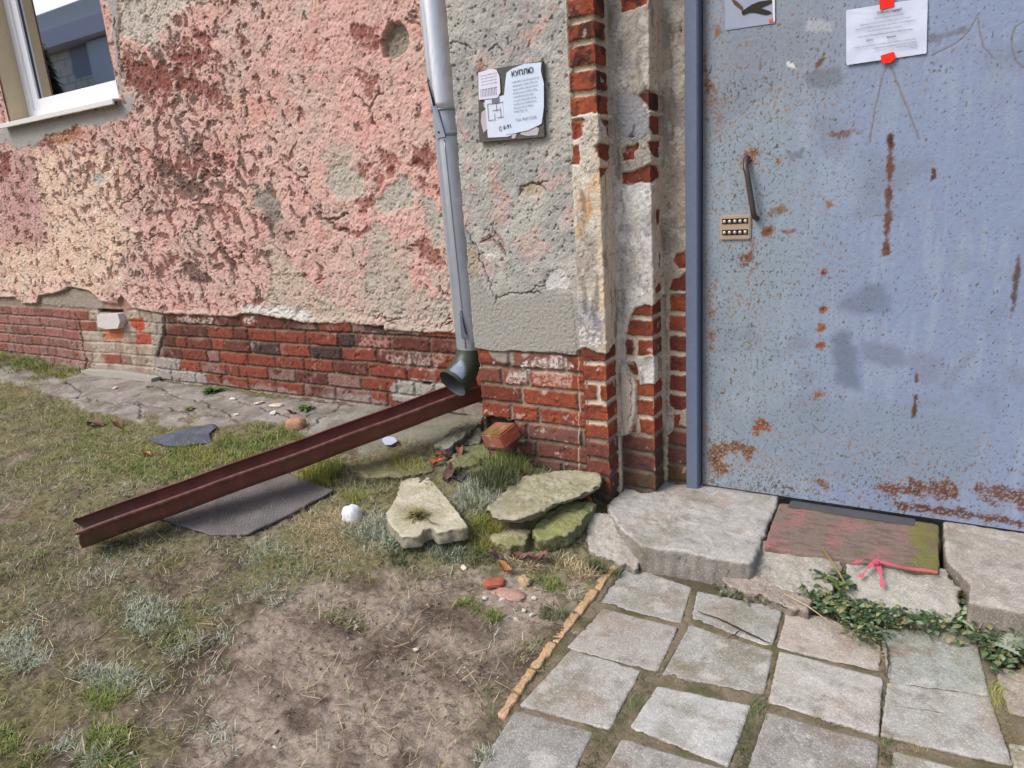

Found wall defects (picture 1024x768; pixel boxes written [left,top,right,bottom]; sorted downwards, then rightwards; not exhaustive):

spalling [345,17,410,60]
spalling [566,0,664,186]
crack [517,180,548,196]
rust [881,132,898,258]
crack [464,223,546,304]
rust [1008,254,1023,323]
spalling [577,251,687,504]
rust [706,416,775,480]
rust [872,473,1024,531]